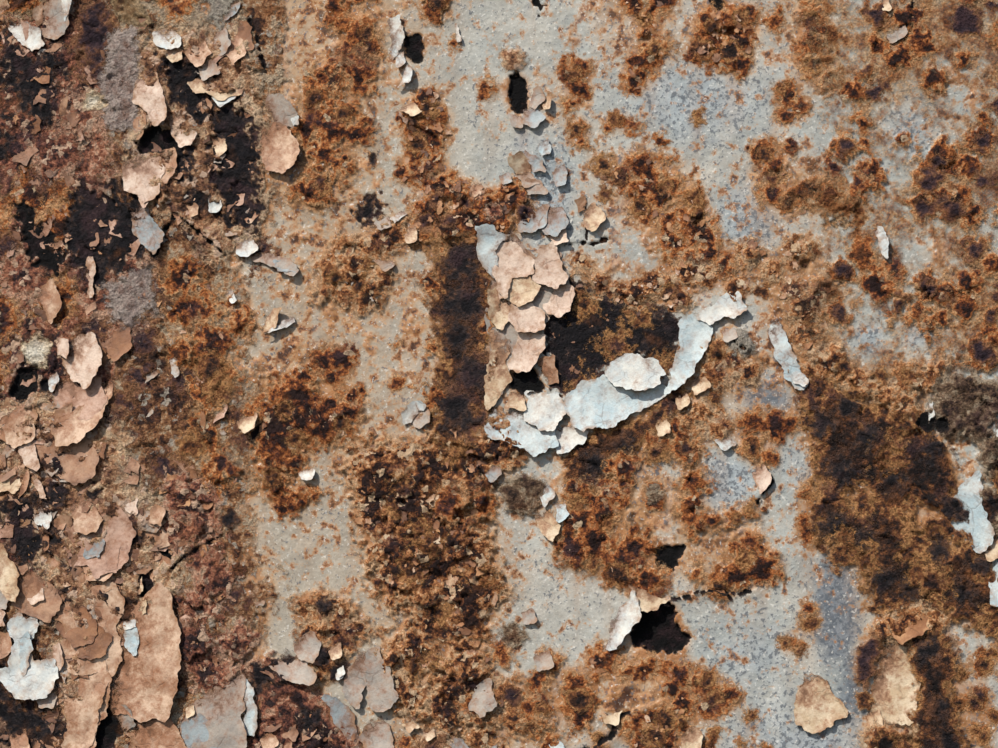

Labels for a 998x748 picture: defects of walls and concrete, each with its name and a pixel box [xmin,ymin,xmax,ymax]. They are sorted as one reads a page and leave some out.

peeling [388,14,424,88]
spalling [508,72,529,114]
spalling [0,0,300,324]
corrosion [0,0,760,748]
peeling [405,164,747,492]
corrosion [547,0,998,748]
peeling [0,325,292,748]
peeling [535,485,569,542]
spalling [605,585,692,655]
crack [670,589,752,601]
peeling [951,471,998,607]
peeling [269,631,399,748]